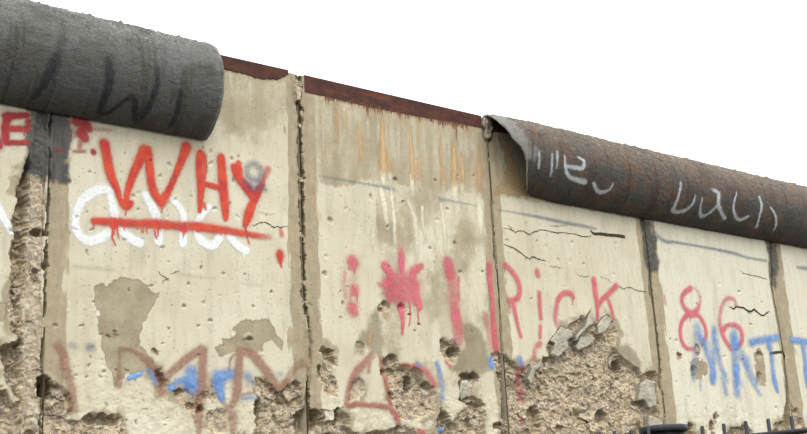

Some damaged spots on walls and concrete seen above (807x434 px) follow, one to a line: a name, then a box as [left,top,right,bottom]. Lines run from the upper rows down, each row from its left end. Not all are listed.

corrosion [325,96,468,185]
crack [504,224,625,268]
spalling [0,151,30,434]
crack [729,306,770,316]
peeling [94,277,229,434]
peeling [215,319,283,357]
spalling [249,301,662,434]
peeling [676,343,708,380]
peeling [754,348,768,389]
spalling [36,377,127,434]
spalling [727,423,754,434]
spalling [771,402,807,434]